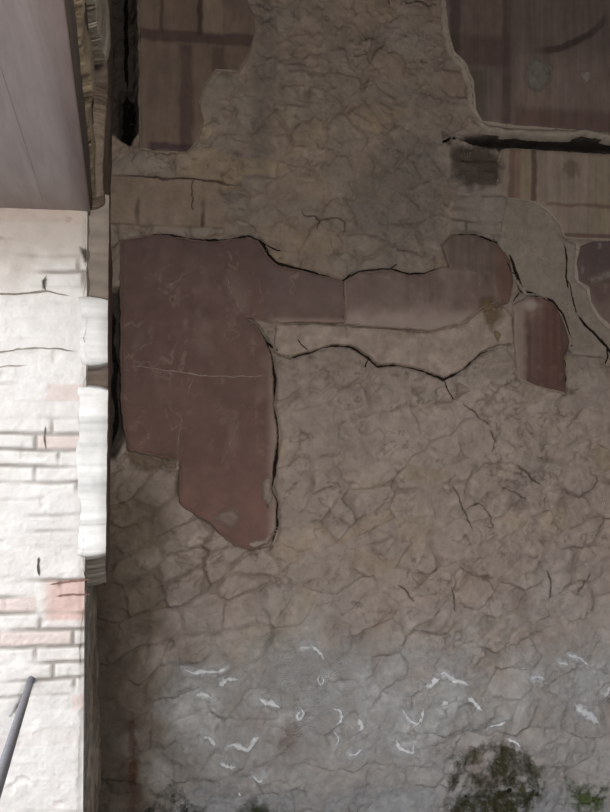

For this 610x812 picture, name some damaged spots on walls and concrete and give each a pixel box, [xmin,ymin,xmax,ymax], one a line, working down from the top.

spalling [452,148,500,185]
spalling [473,120,610,146]
crack [153,234,438,281]
spalling [273,306,514,378]
crack [457,234,610,382]
crack [111,277,491,549]
leakage [166,645,505,776]
leakage [527,652,610,724]
leakage [475,790,580,812]